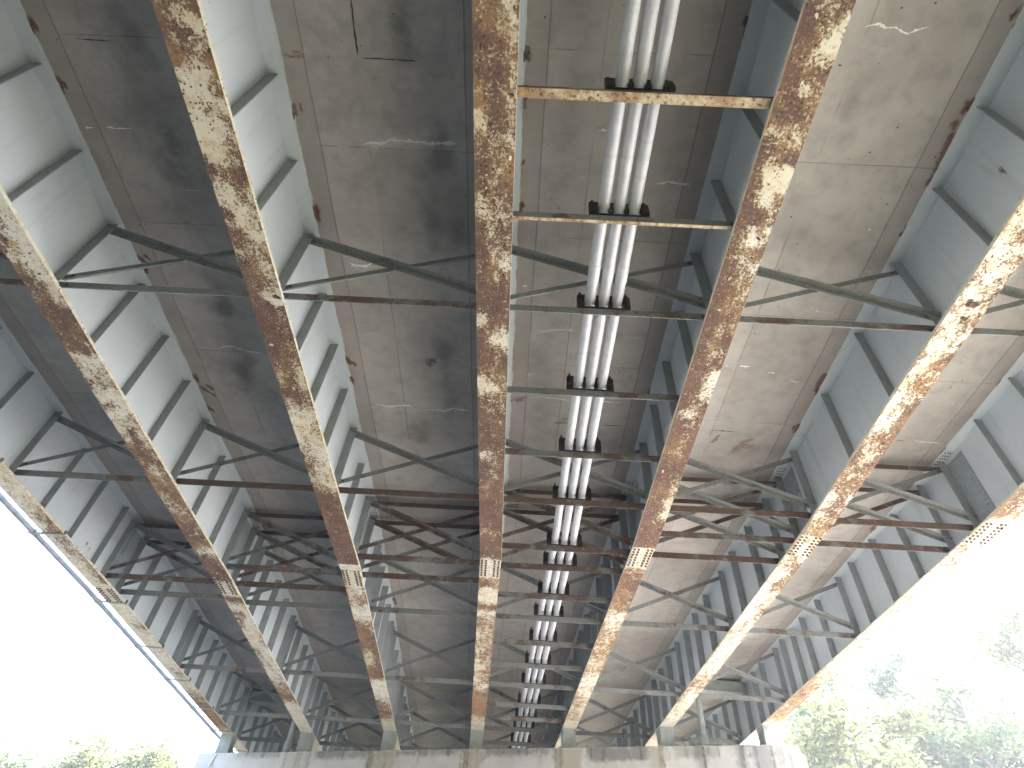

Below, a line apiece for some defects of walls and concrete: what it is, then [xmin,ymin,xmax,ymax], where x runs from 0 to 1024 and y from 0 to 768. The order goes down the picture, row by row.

rust [0,207,301,712]
rust [117,607,230,734]
rust [152,0,393,731]
crack [351,0,414,61]
crack [357,137,459,150]
rust [471,0,531,726]
rust [566,0,856,721]
rust [665,200,1024,726]
crack [866,22,930,35]